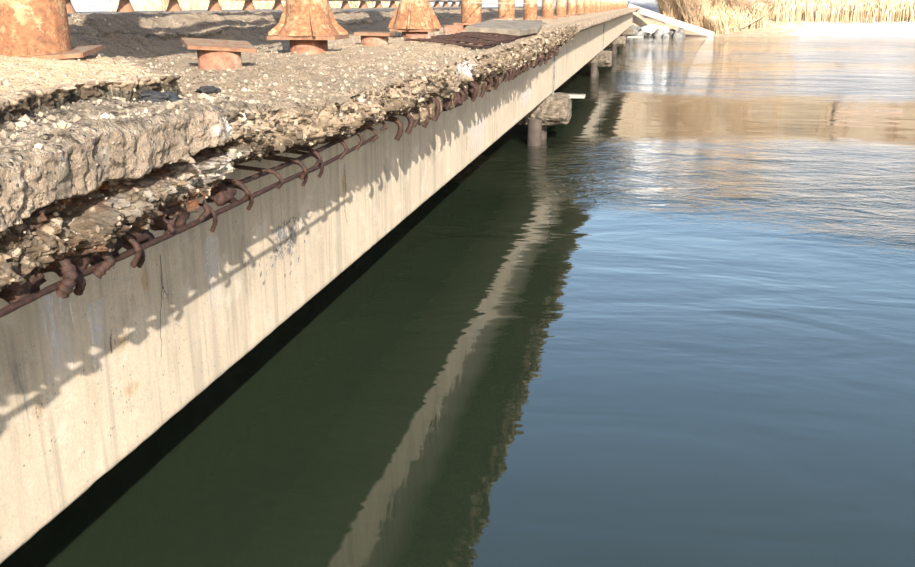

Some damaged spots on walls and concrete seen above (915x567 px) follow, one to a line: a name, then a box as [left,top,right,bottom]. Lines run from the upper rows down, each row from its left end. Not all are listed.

crack [160,255,169,350]
spalling [0,24,579,318]